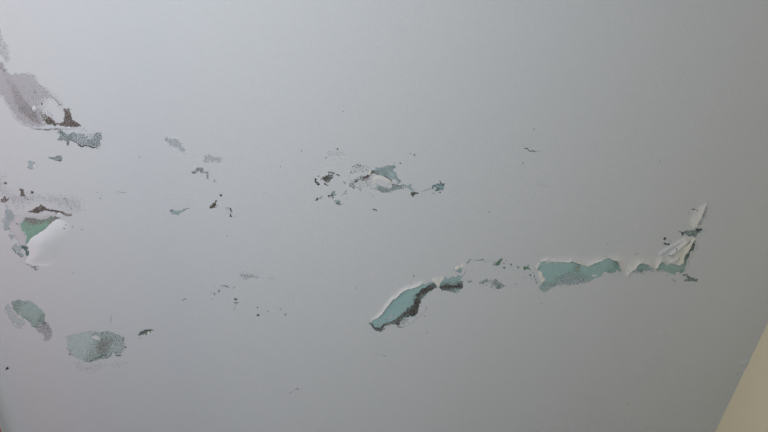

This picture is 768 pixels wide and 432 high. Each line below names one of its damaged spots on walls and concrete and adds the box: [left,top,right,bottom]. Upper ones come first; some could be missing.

peeling [0,62,102,147]
peeling [349,162,445,197]
peeling [0,182,82,271]
peeling [493,227,706,293]
peeling [5,299,52,341]
peeling [64,330,126,362]
peeling [369,263,465,332]